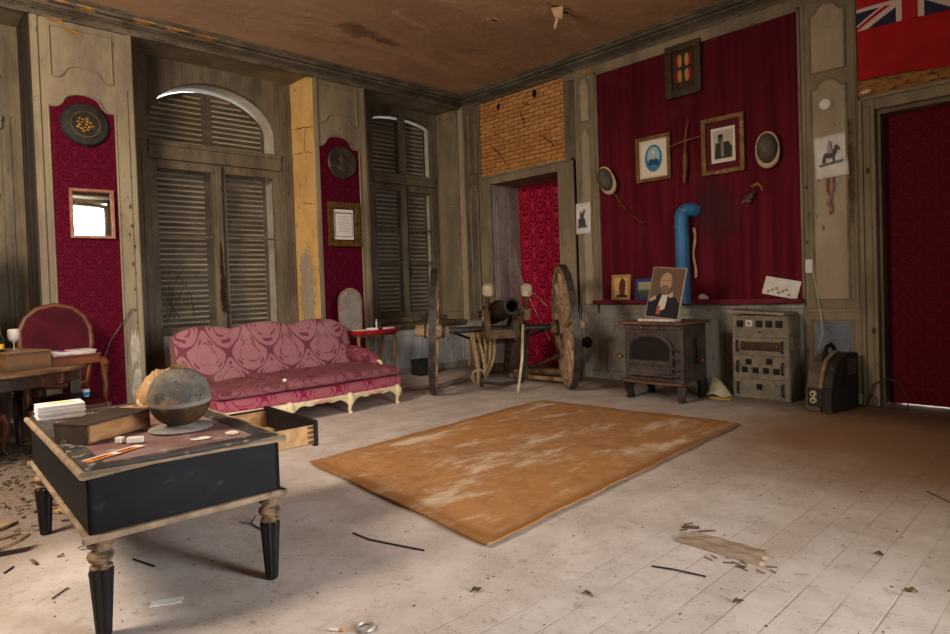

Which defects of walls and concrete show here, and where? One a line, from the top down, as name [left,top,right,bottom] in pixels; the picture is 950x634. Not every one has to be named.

peeling [539,0,577,29]